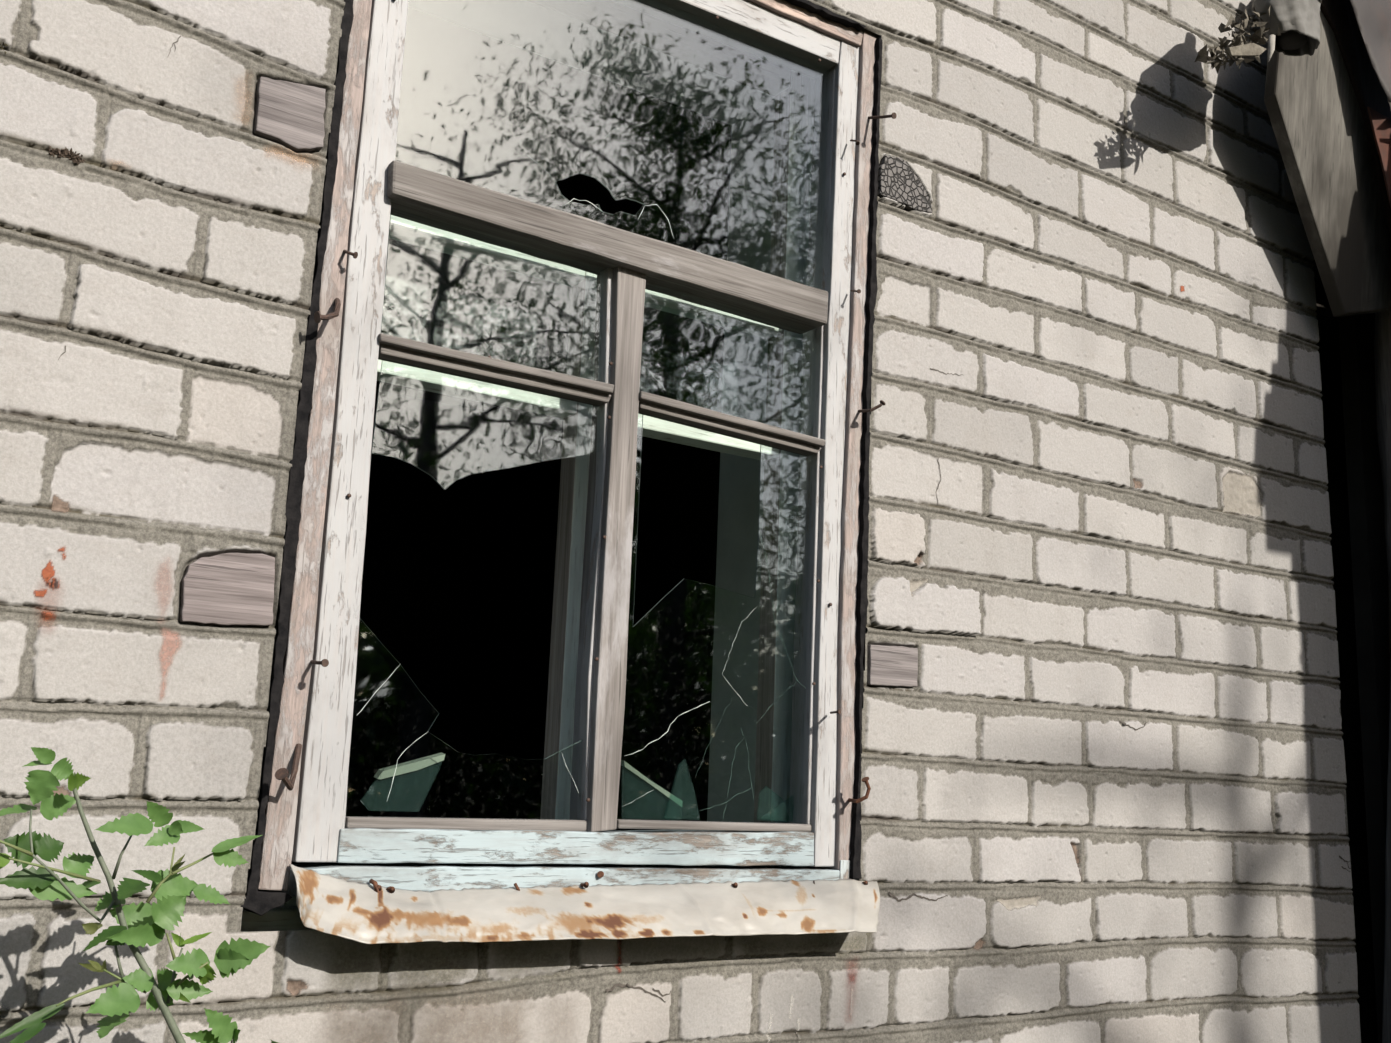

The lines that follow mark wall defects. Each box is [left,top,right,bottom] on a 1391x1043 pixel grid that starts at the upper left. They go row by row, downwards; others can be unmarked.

rust [34,547,66,620]